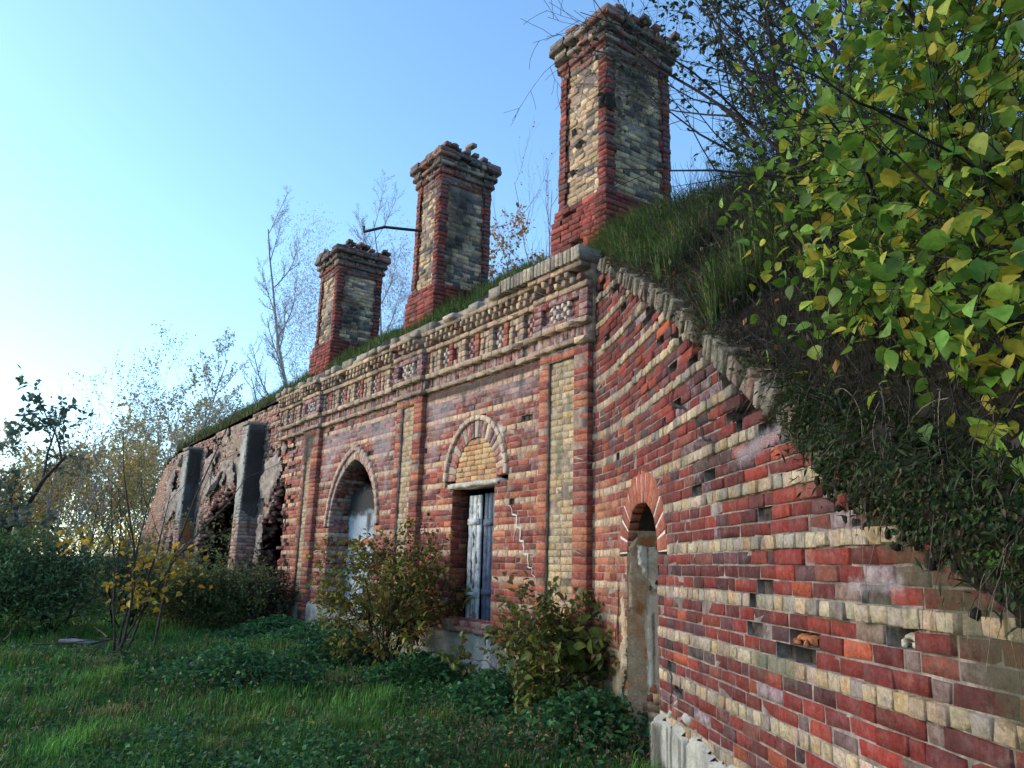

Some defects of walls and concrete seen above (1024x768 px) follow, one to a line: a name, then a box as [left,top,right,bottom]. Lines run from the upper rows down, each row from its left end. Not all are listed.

peeling [156,457,183,560]
spalling [193,448,241,575]
spalling [252,443,289,586]
crack [508,505,535,577]